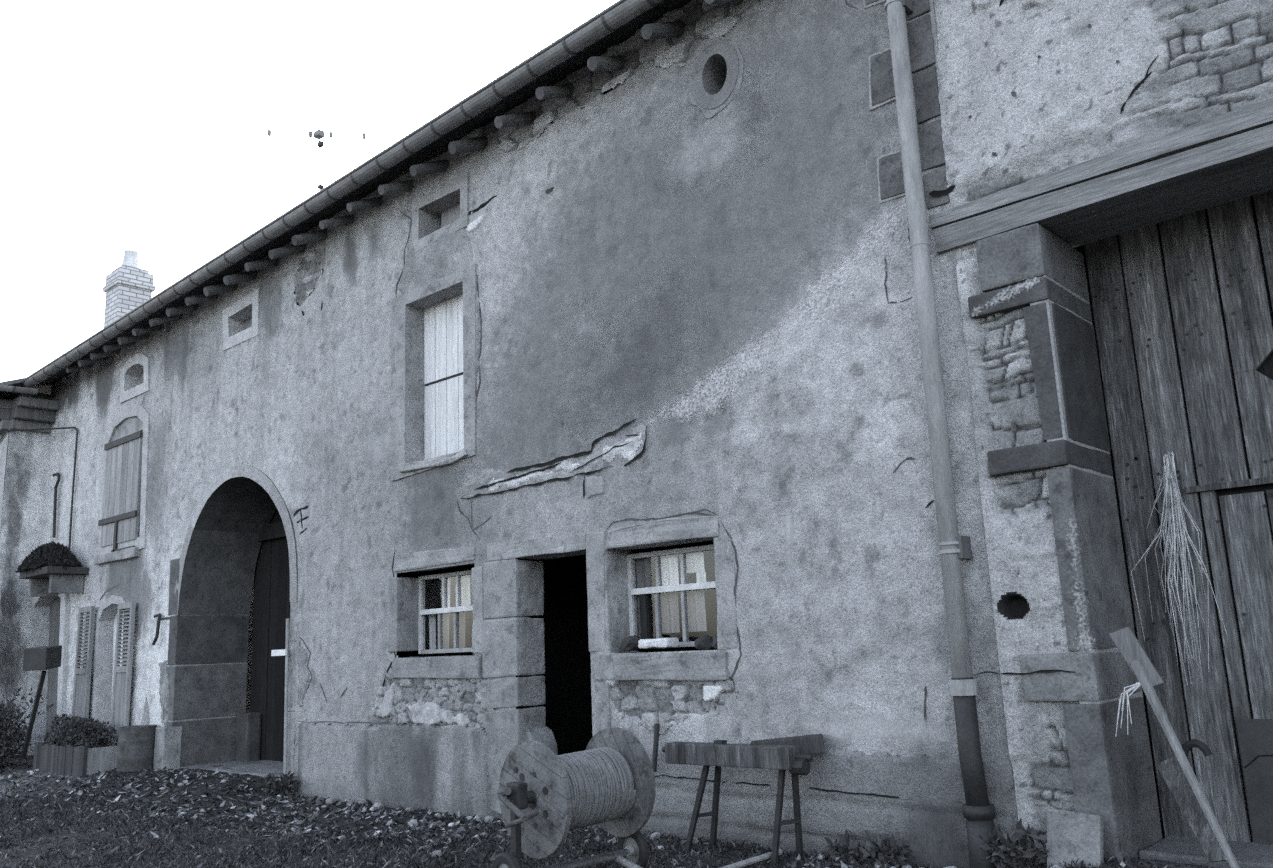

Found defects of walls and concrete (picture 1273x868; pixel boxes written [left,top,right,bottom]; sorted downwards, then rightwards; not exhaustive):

crack [1120,56,1158,114]
crack [467,195,497,232]
spalling [372,671,494,728]
spalling [606,679,737,734]